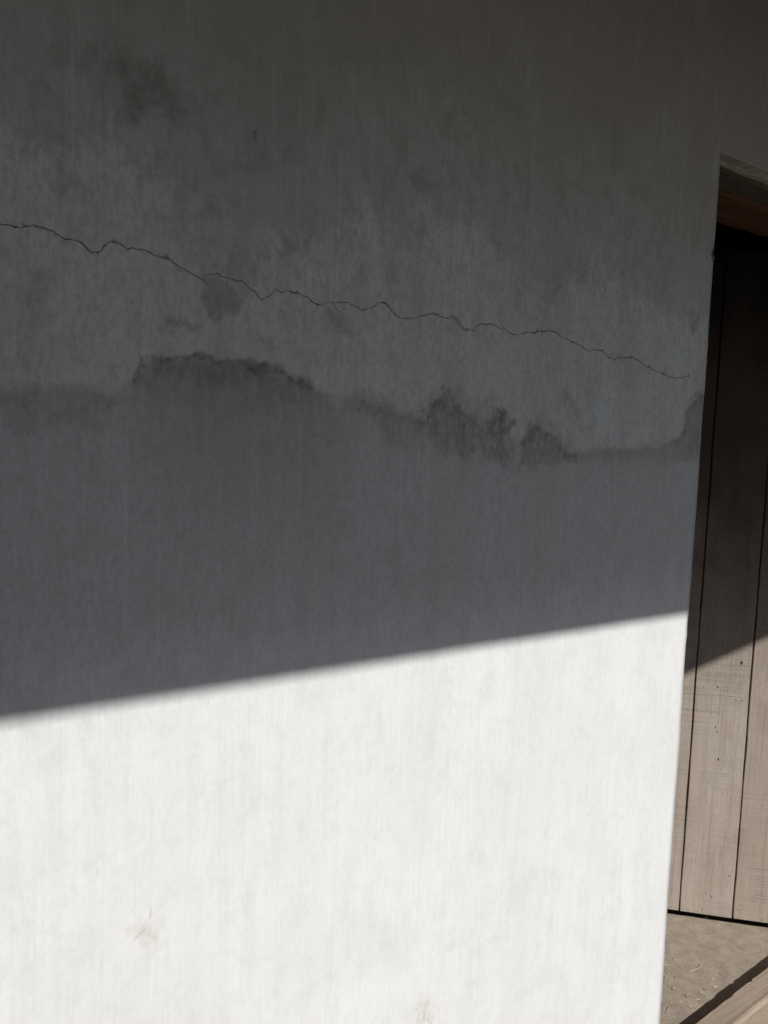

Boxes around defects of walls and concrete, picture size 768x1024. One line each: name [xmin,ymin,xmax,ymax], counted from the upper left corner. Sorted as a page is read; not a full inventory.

crack [0,222,687,379]